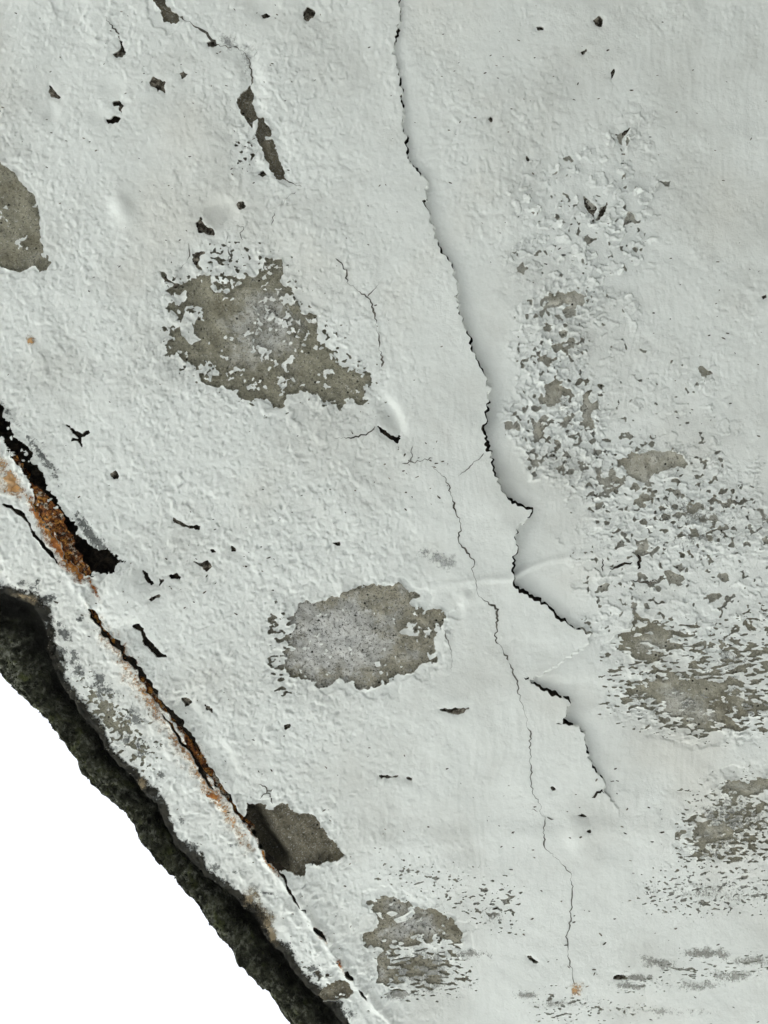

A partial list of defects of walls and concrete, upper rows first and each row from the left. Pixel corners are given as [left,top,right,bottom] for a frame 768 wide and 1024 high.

crack [394,0,421,175]
spalling [0,162,51,272]
spalling [160,217,381,418]
crack [3,504,58,564]
rust [0,459,98,597]
spalling [504,287,768,738]
crack [88,609,273,823]
rust [100,634,279,877]
spalling [246,803,345,876]
crack [265,853,327,942]
spalling [268,582,446,696]
crack [403,401,604,985]